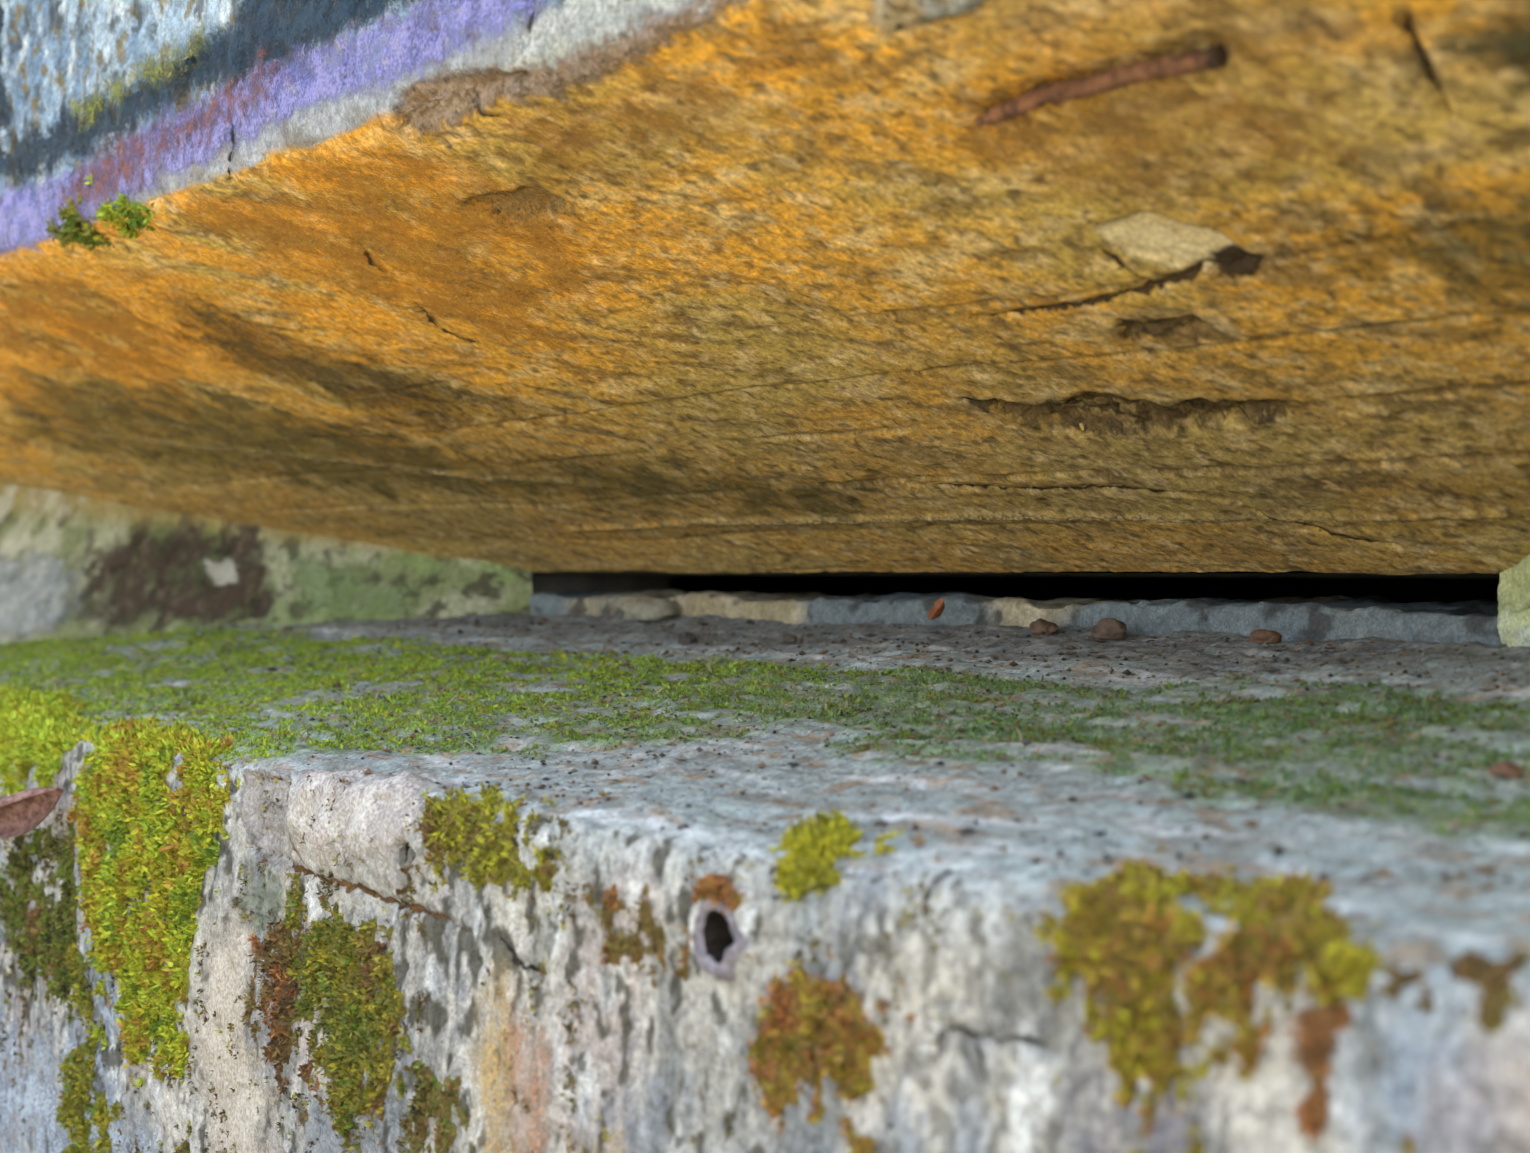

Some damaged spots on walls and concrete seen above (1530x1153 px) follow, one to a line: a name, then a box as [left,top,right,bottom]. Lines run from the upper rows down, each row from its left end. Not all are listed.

rust [975,44,1229,127]
spalling [1095,211,1264,277]
crack [989,247,1242,316]
spalling [966,391,1301,436]